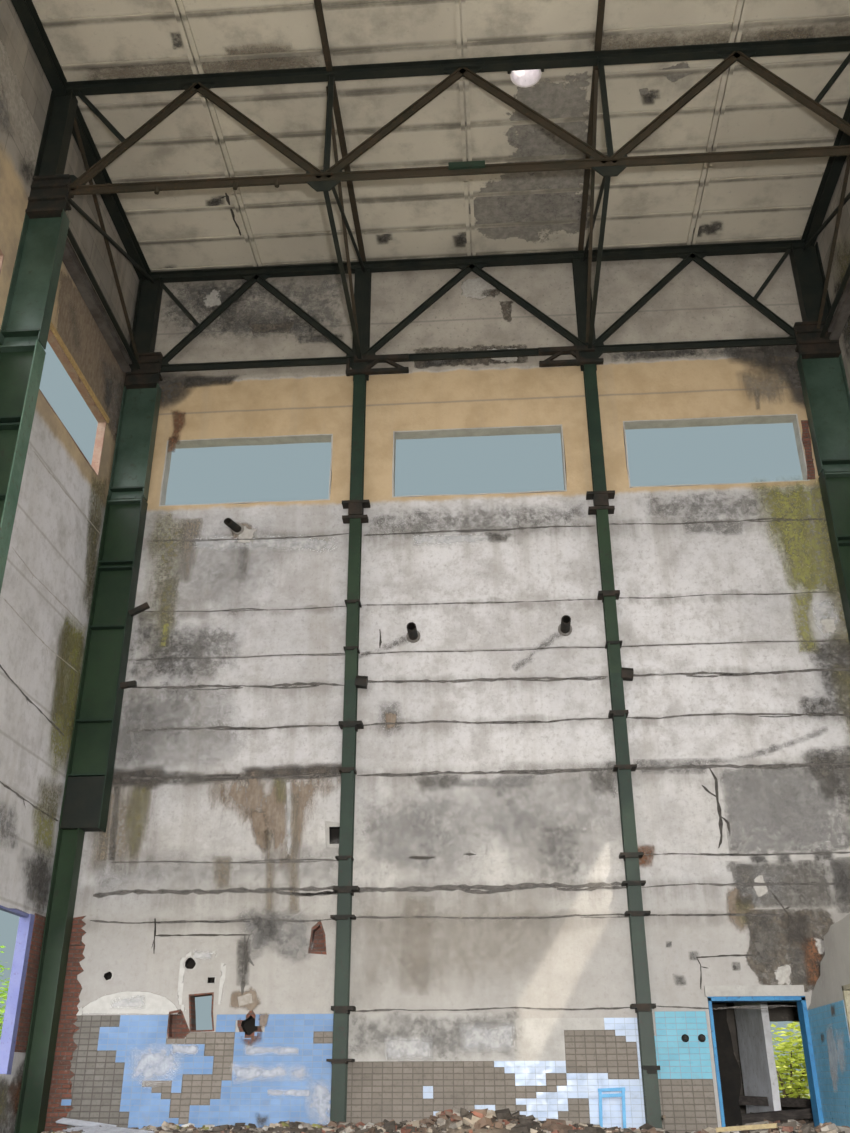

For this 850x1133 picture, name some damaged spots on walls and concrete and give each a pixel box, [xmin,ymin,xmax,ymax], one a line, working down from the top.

peeling [454,72,591,247]
water stain [168,281,342,343]
water stain [130,520,233,676]
water stain [775,490,850,727]
peeling [44,916,129,1132]
water stain [93,786,149,865]
peeling [142,988,262,1124]
water stain [164,771,331,984]
crack [90,763,850,994]
peeling [346,1013,639,1129]
flaking render [733,909,834,992]
water stain [722,747,850,929]